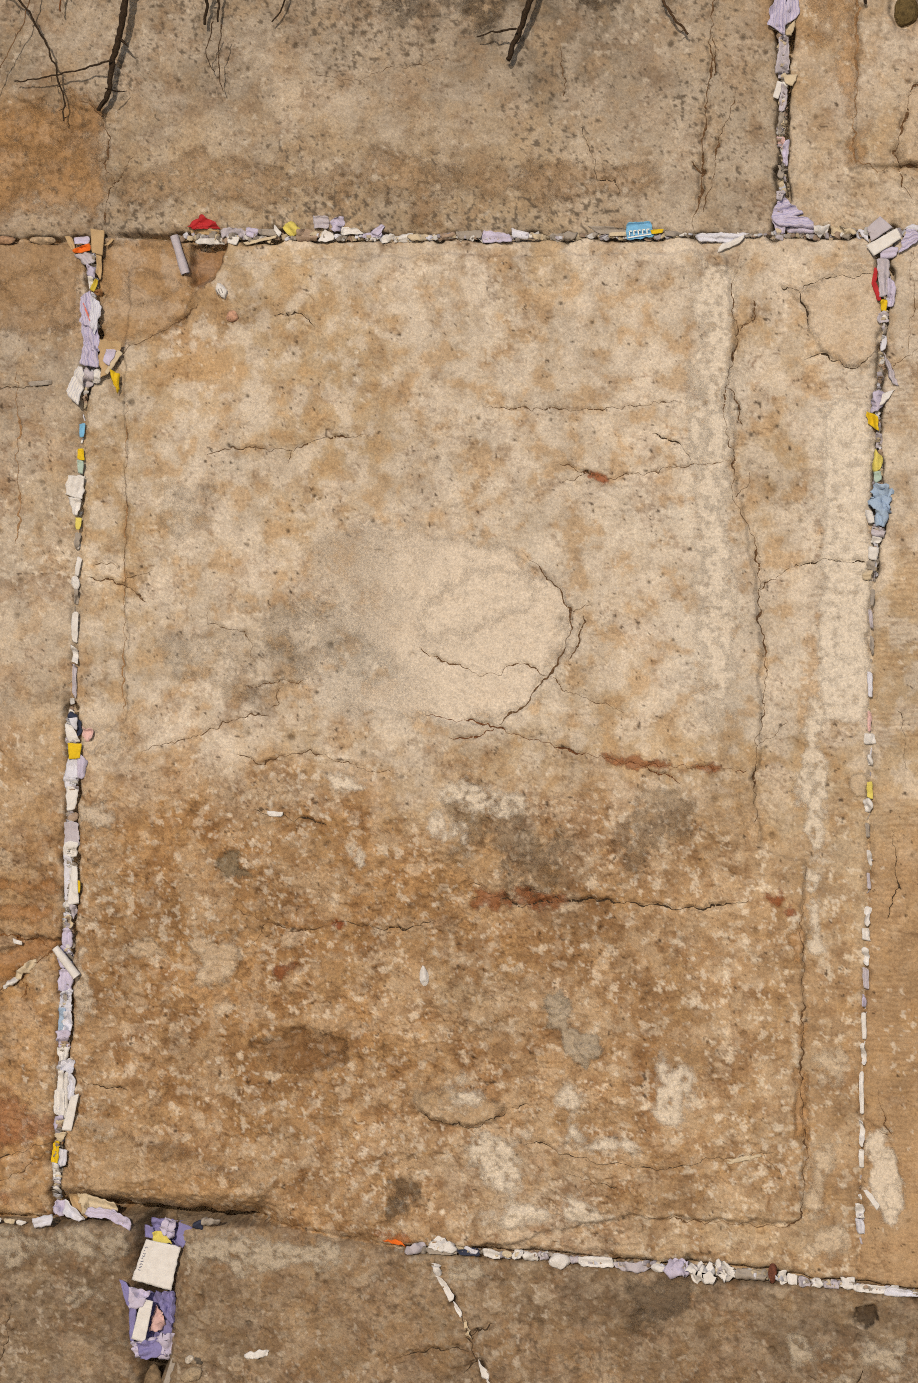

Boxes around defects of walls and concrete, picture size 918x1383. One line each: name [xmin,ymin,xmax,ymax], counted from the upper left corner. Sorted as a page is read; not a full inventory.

crack [692,0,735,229]
crack [849,0,918,198]
crack [419,252,916,842]
crack [468,882,753,911]
crack [887,832,902,919]
crack [421,1103,527,1129]
crack [526,867,809,1228]